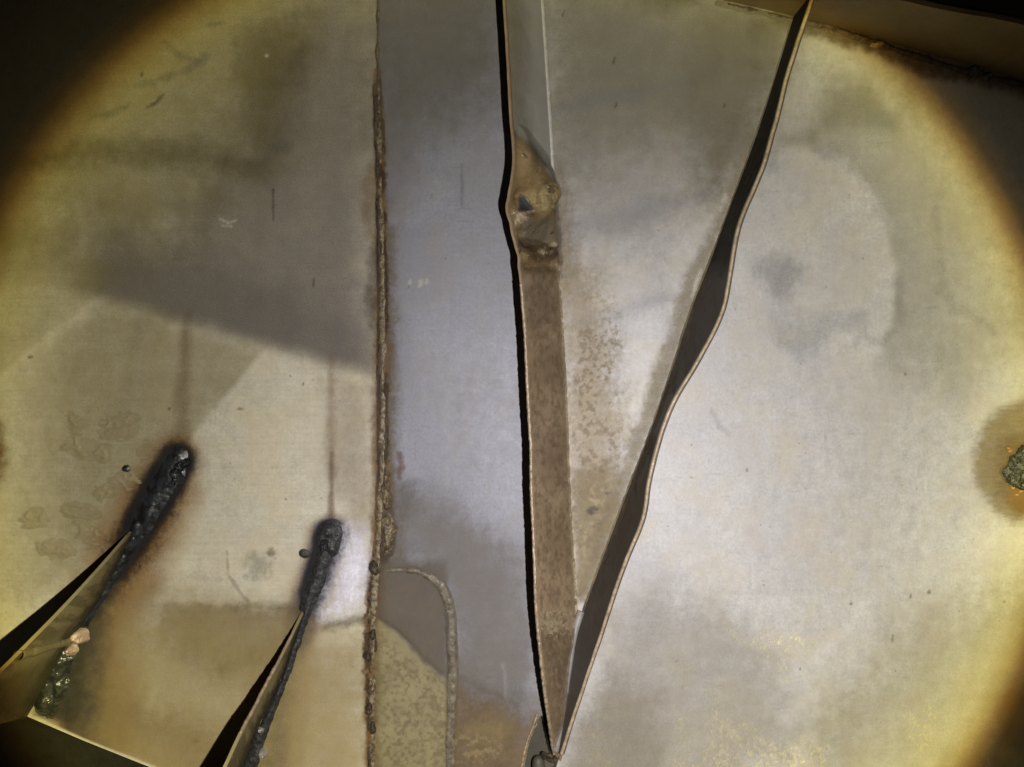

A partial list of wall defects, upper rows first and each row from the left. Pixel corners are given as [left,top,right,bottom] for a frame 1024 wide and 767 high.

corrosion [364,69,403,767]
corrosion [976,403,1024,516]